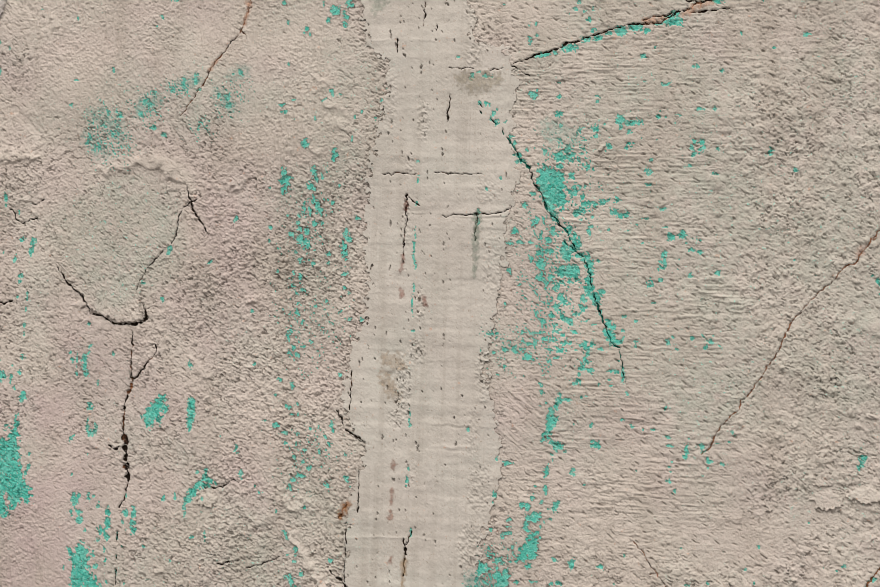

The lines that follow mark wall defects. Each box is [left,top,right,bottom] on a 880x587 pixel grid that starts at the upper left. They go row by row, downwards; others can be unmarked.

peeling [322,0,355,28]
crack [449,0,730,76]
peeling [534,0,686,58]
peeling [478,100,507,127]
crack [479,103,626,382]
peeling [646,226,704,289]
crack [57,190,207,508]
peeling [474,110,649,587]
peeling [0,354,34,518]
peeling [665,430,736,495]
peeling [62,492,137,587]